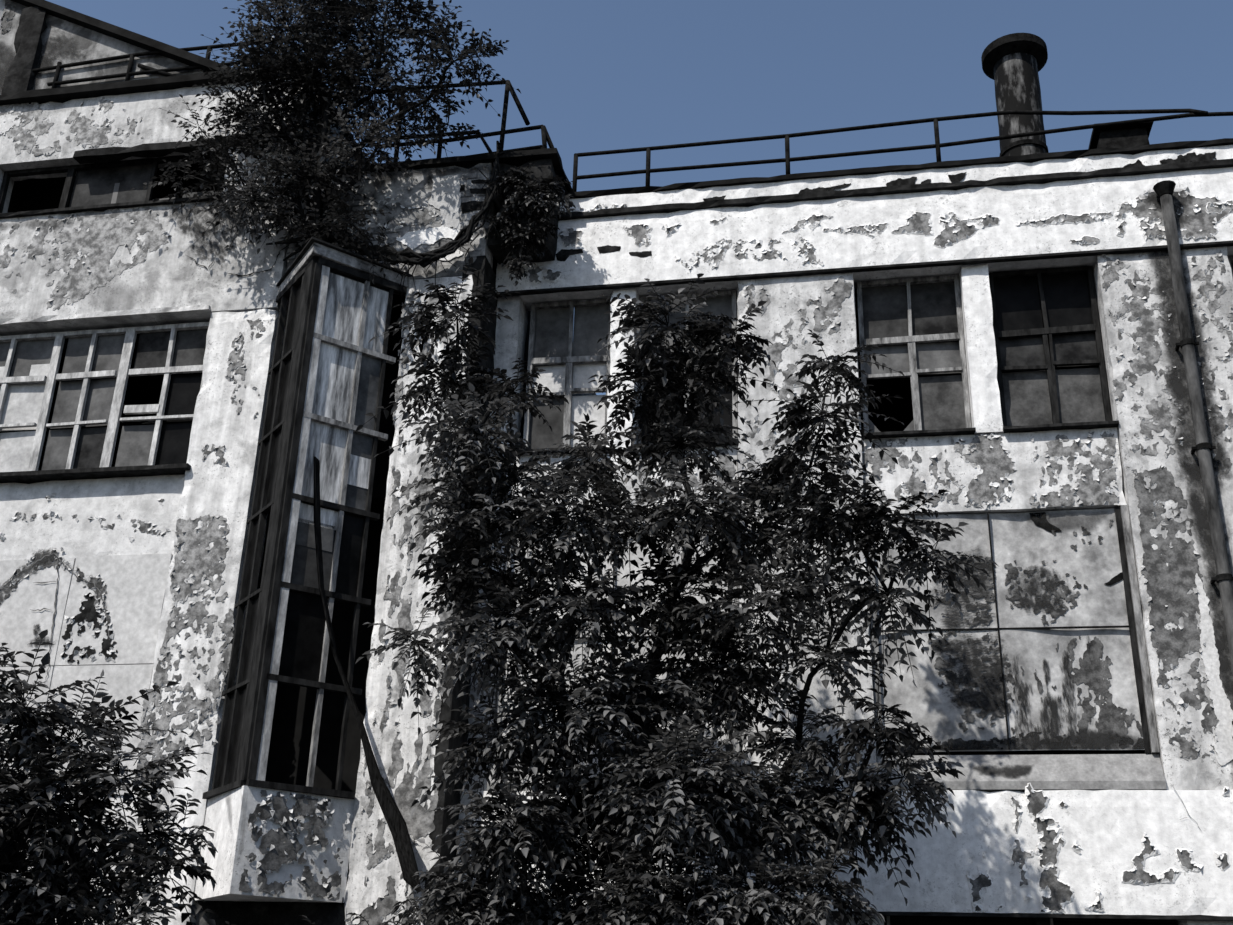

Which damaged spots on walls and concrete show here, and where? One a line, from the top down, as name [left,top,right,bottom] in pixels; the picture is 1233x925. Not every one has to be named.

peeling [0,96,143,156]
peeling [0,205,170,310]
peeling [623,222,681,247]
peeling [675,211,1000,270]
peeling [225,318,265,419]
peeling [766,276,852,403]
peeling [797,433,1017,510]
peeling [1015,187,1233,761]
peeling [239,291,461,901]
peeling [0,493,234,810]
peeling [1009,783,1105,914]
peeling [1121,832,1230,886]